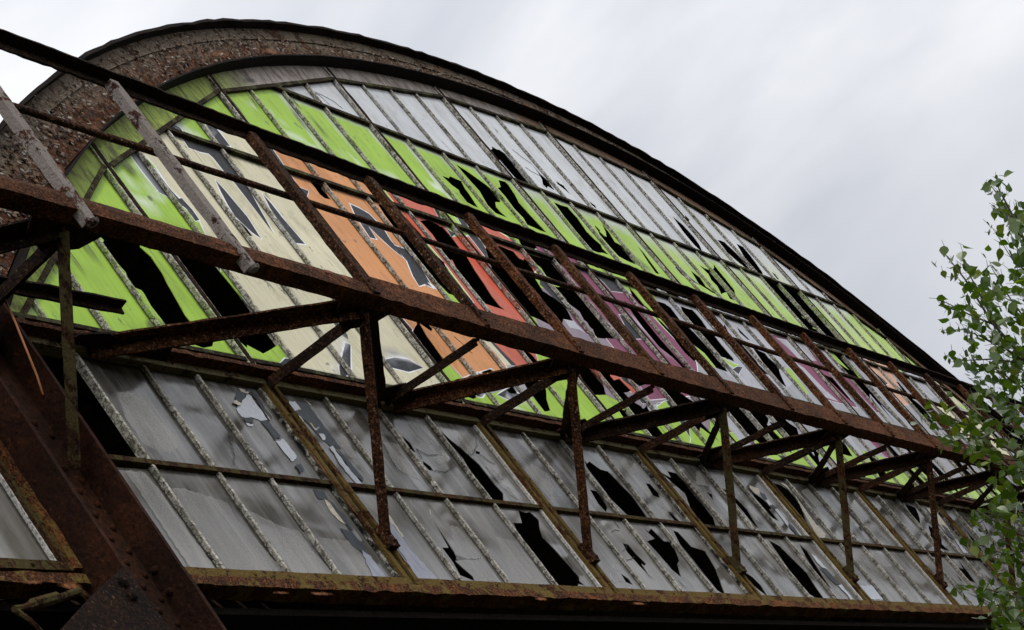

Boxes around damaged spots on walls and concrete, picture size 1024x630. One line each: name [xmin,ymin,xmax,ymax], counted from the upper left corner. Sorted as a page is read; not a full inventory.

rust [0,127,49,187]
rust [25,76,121,174]
rust [0,208,30,225]
peeling [234,388,305,474]
peeling [289,401,364,484]
peeling [313,489,386,577]